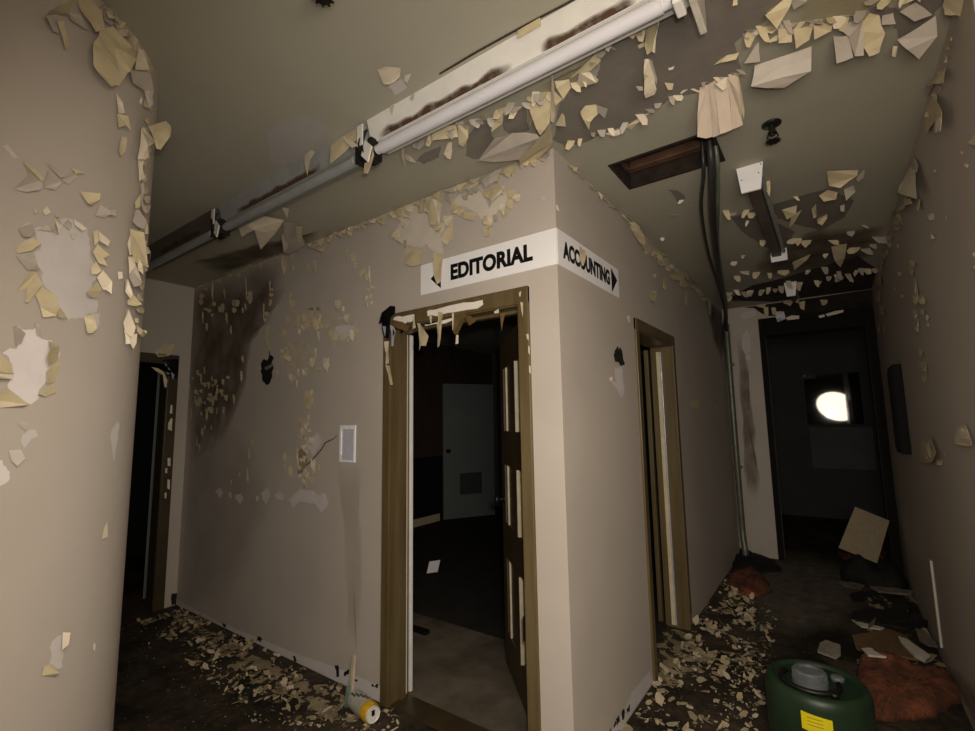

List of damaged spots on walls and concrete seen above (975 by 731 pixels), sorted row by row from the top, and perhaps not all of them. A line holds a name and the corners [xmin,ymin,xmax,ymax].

corrosion [545,1,631,51]
corrosion [384,69,503,136]
peeling [0,0,171,408]
peeling [194,0,964,360]
peeling [152,343,175,387]
leakage [197,284,270,427]
peeling [188,281,295,452]
peeling [384,341,393,385]
spalling [609,346,625,398]
peeling [0,422,38,486]
peeling [256,389,329,512]